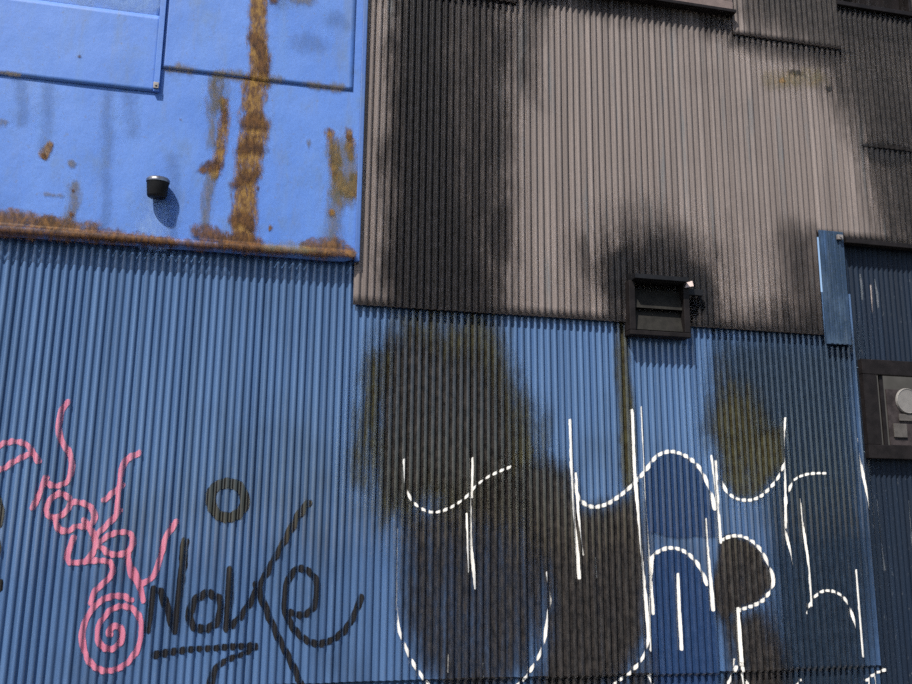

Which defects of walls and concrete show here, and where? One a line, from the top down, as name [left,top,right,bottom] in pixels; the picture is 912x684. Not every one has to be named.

corrosion [0,0,357,260]